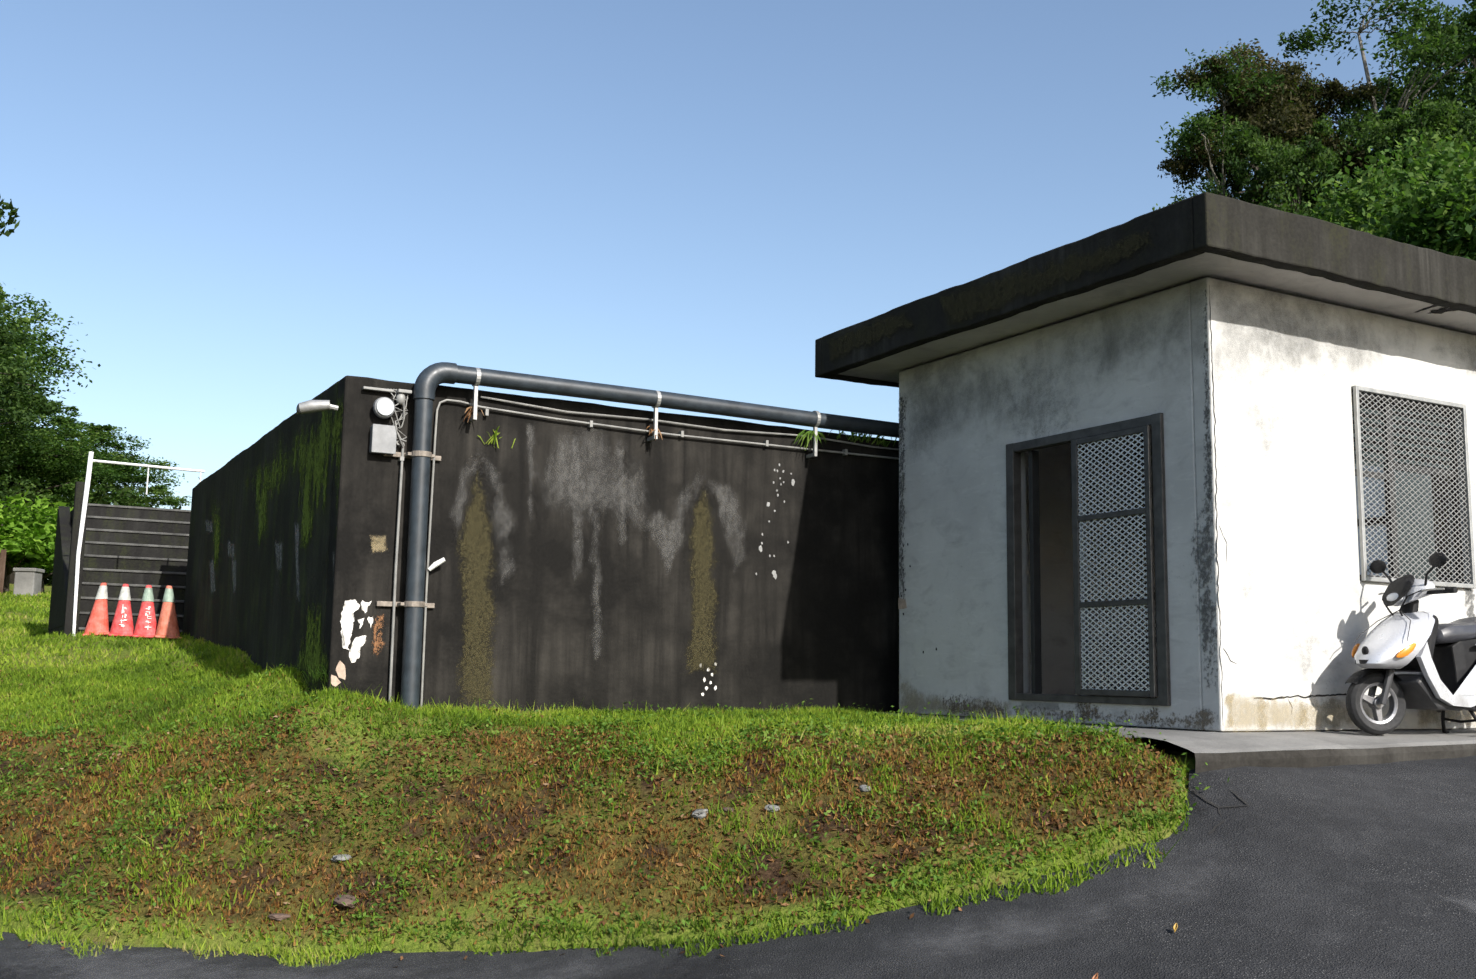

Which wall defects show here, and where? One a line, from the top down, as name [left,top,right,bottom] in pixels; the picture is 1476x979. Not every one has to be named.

peeling [330,599,373,687]